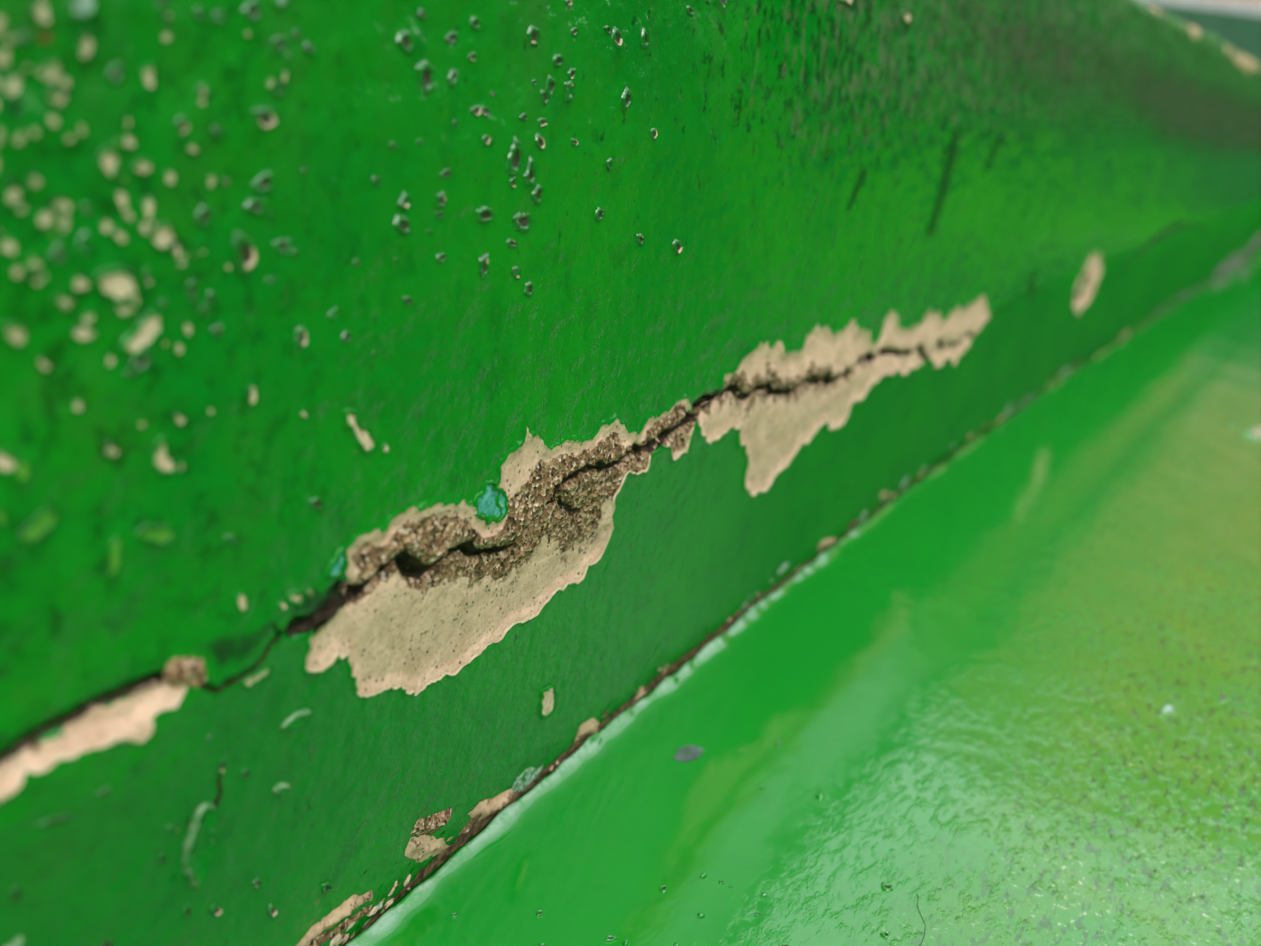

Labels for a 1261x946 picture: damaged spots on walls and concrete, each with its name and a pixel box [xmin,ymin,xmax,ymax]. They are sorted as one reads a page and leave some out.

peeling [0,0,100,168]
peeling [0,114,223,378]
peeling [506,54,576,247]
flaking render [1071,247,1103,318]
peeling [0,448,20,474]
peeling [149,435,185,476]
crack [0,287,1051,764]
flaking render [301,288,990,701]
crack [342,250,1260,946]
flaking render [0,681,187,805]
crack [214,766,223,809]
spalling [296,683,651,946]